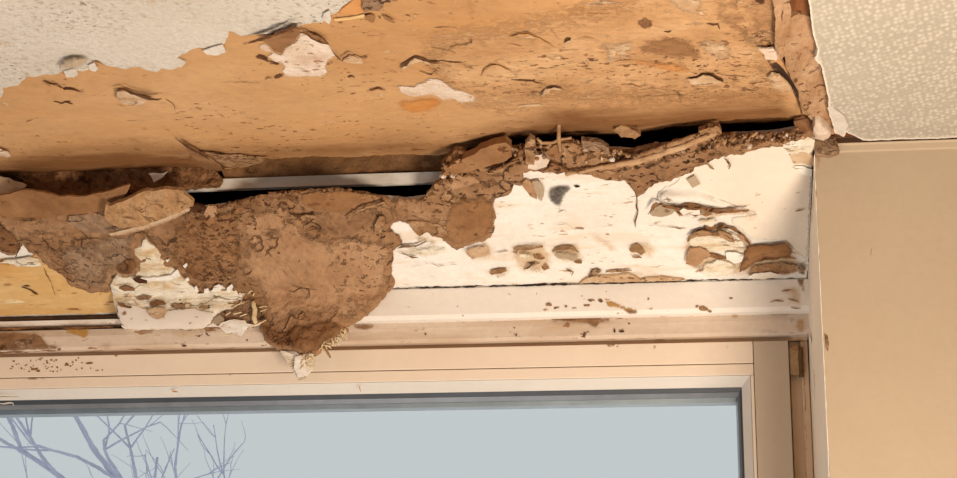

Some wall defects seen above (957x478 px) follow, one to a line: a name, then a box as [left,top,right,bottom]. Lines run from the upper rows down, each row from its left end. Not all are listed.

flaking render [0,0,854,381]